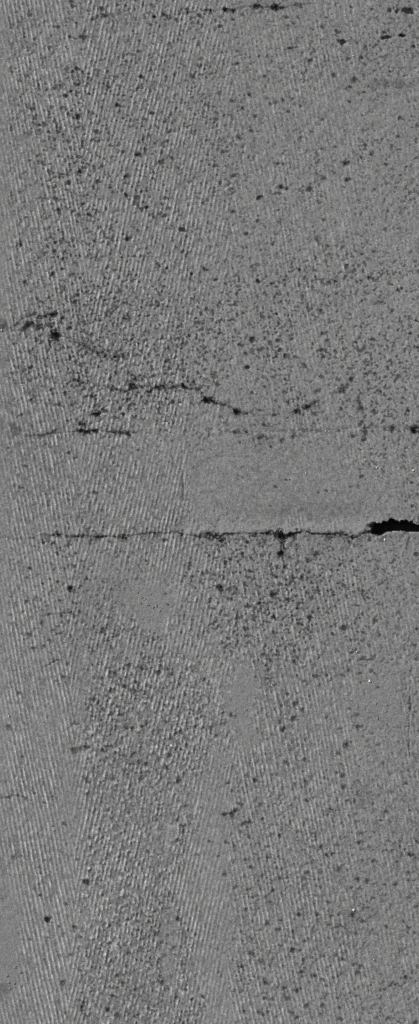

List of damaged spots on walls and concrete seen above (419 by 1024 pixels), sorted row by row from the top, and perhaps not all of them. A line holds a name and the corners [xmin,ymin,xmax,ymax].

spalling [368,519,419,535]
crack [53,531,376,550]